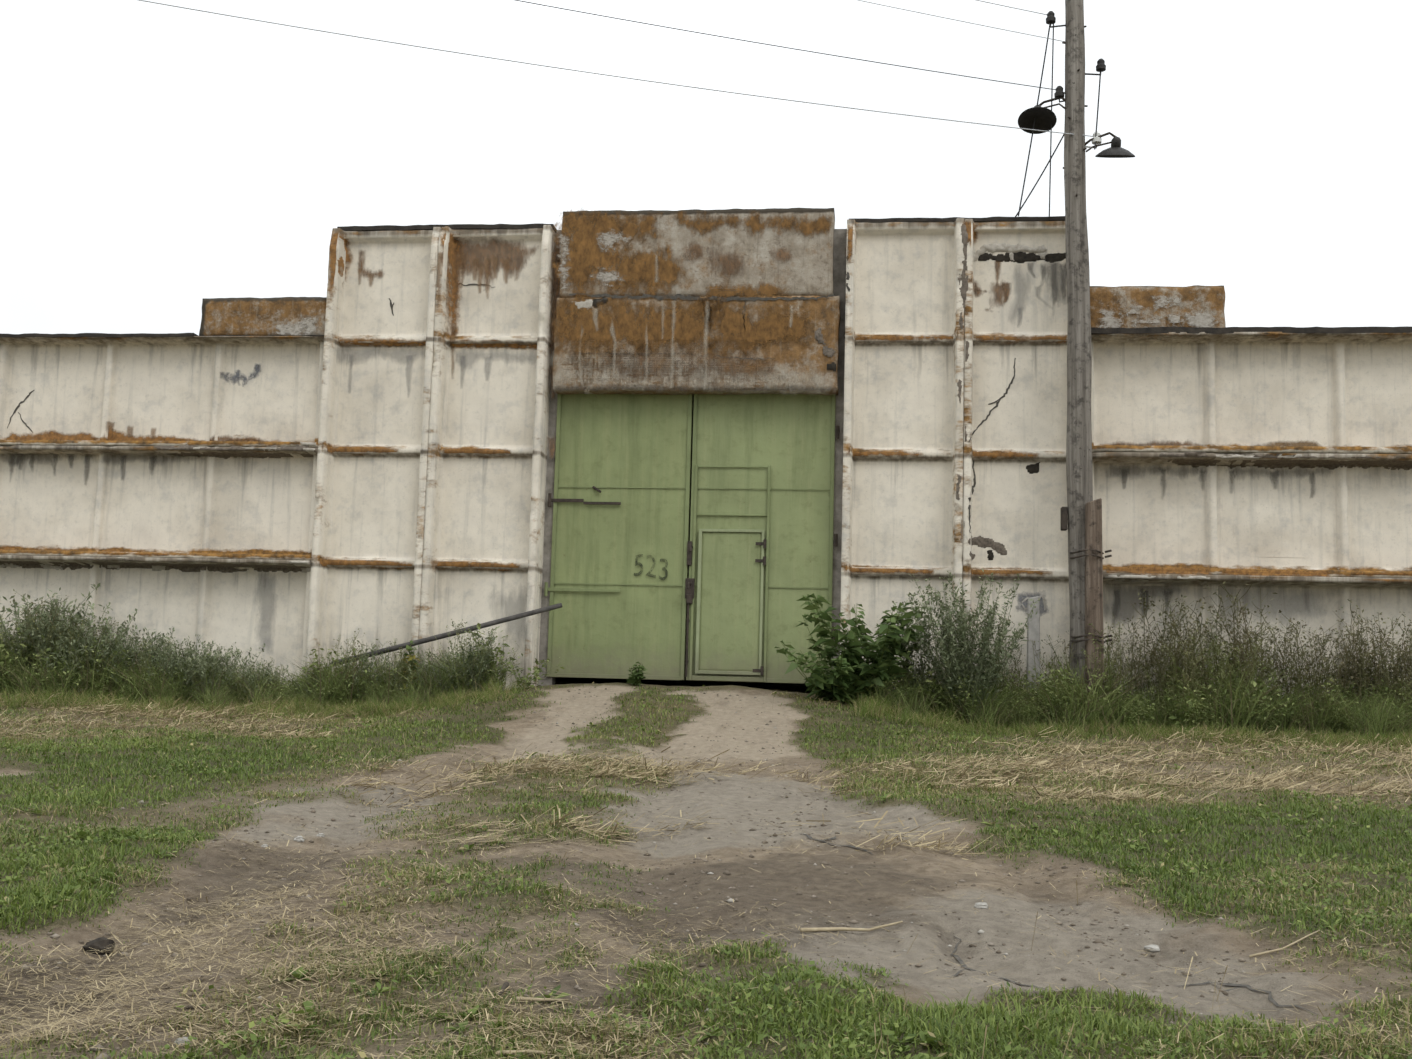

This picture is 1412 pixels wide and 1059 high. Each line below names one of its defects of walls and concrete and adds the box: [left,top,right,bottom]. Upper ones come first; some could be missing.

rust [437,210,832,396]
spalling [958,224,1066,362]
crack [7,390,35,433]
rust [6,423,189,441]
crack [968,358,1016,533]
rust [93,548,169,556]
spalling [960,519,1007,560]
rust [1106,567,1329,578]
rust [1354,569,1412,582]